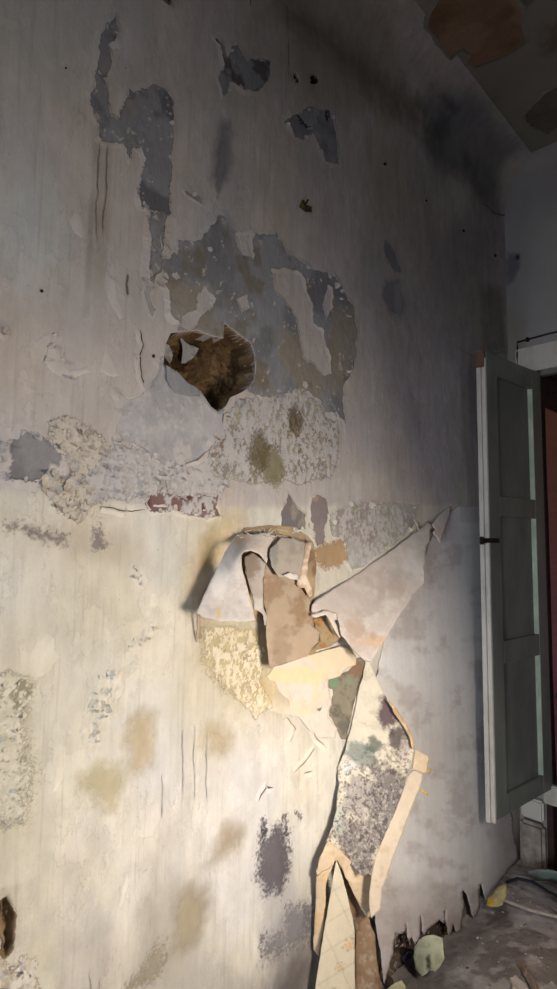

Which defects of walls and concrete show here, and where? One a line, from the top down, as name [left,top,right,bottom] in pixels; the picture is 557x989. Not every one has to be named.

flaking render [423,0,531,68]
peeling [0,12,420,572]
peeling [200,625,272,720]
peeling [0,669,37,832]
flaking render [0,894,41,989]
flaking render [379,920,454,989]